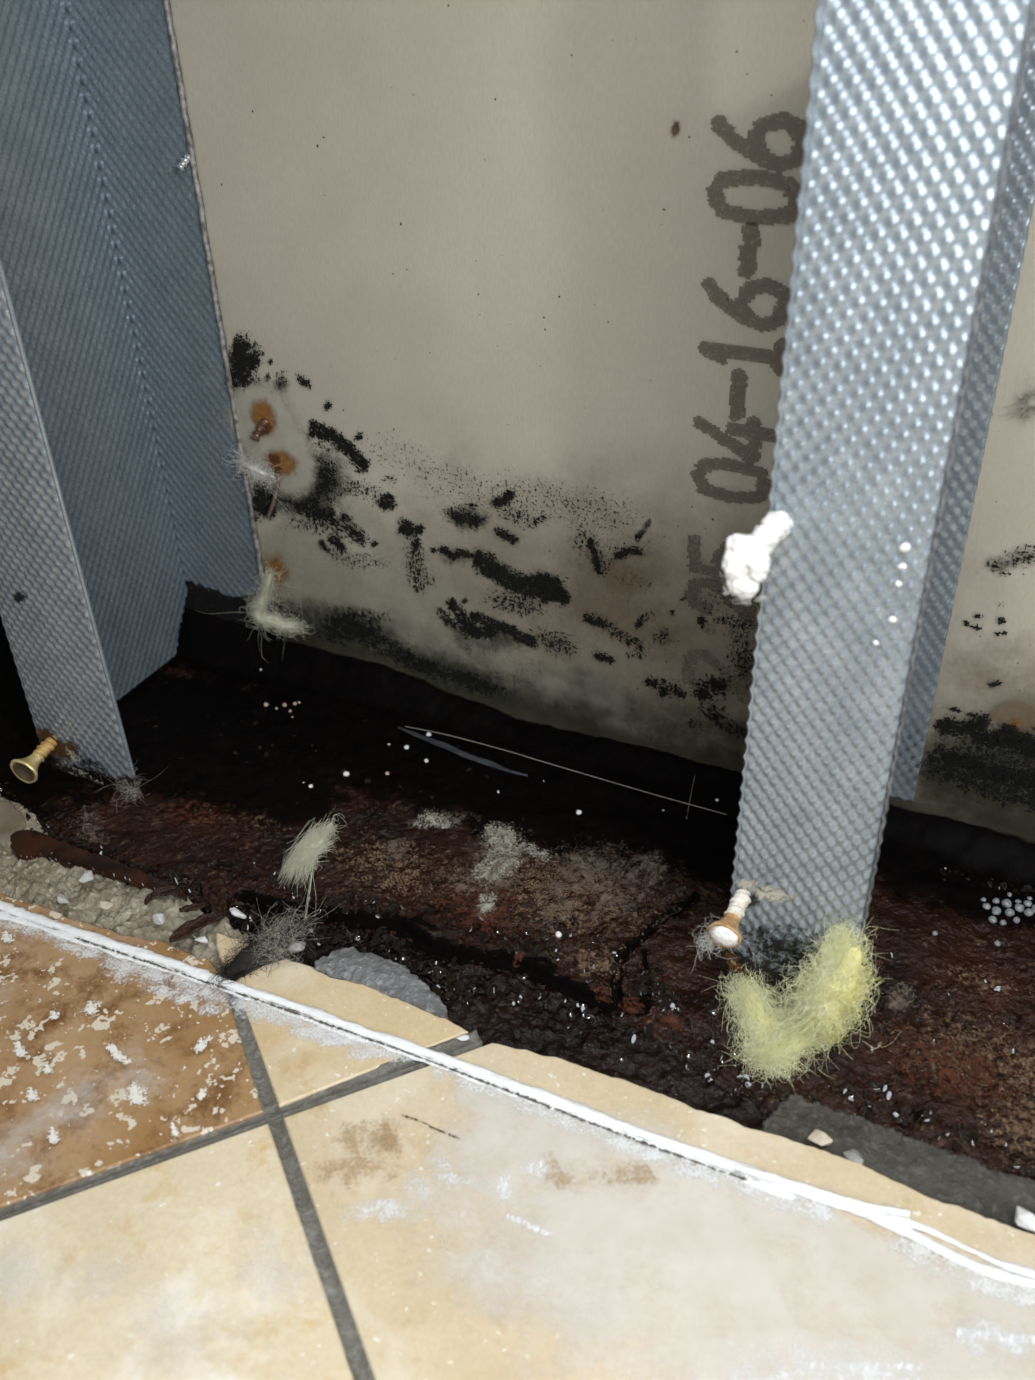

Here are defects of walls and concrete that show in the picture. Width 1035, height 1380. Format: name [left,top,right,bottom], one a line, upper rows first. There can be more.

mould [223,330,312,394]
water stain [184,400,758,773]
corrosion [36,728,291,835]
water stain [889,707,1035,842]
corrosion [144,885,225,943]
water stain [104,960,375,1060]
crack [234,890,701,1017]
corrosion [318,827,685,1034]
corrosion [843,965,1035,1168]